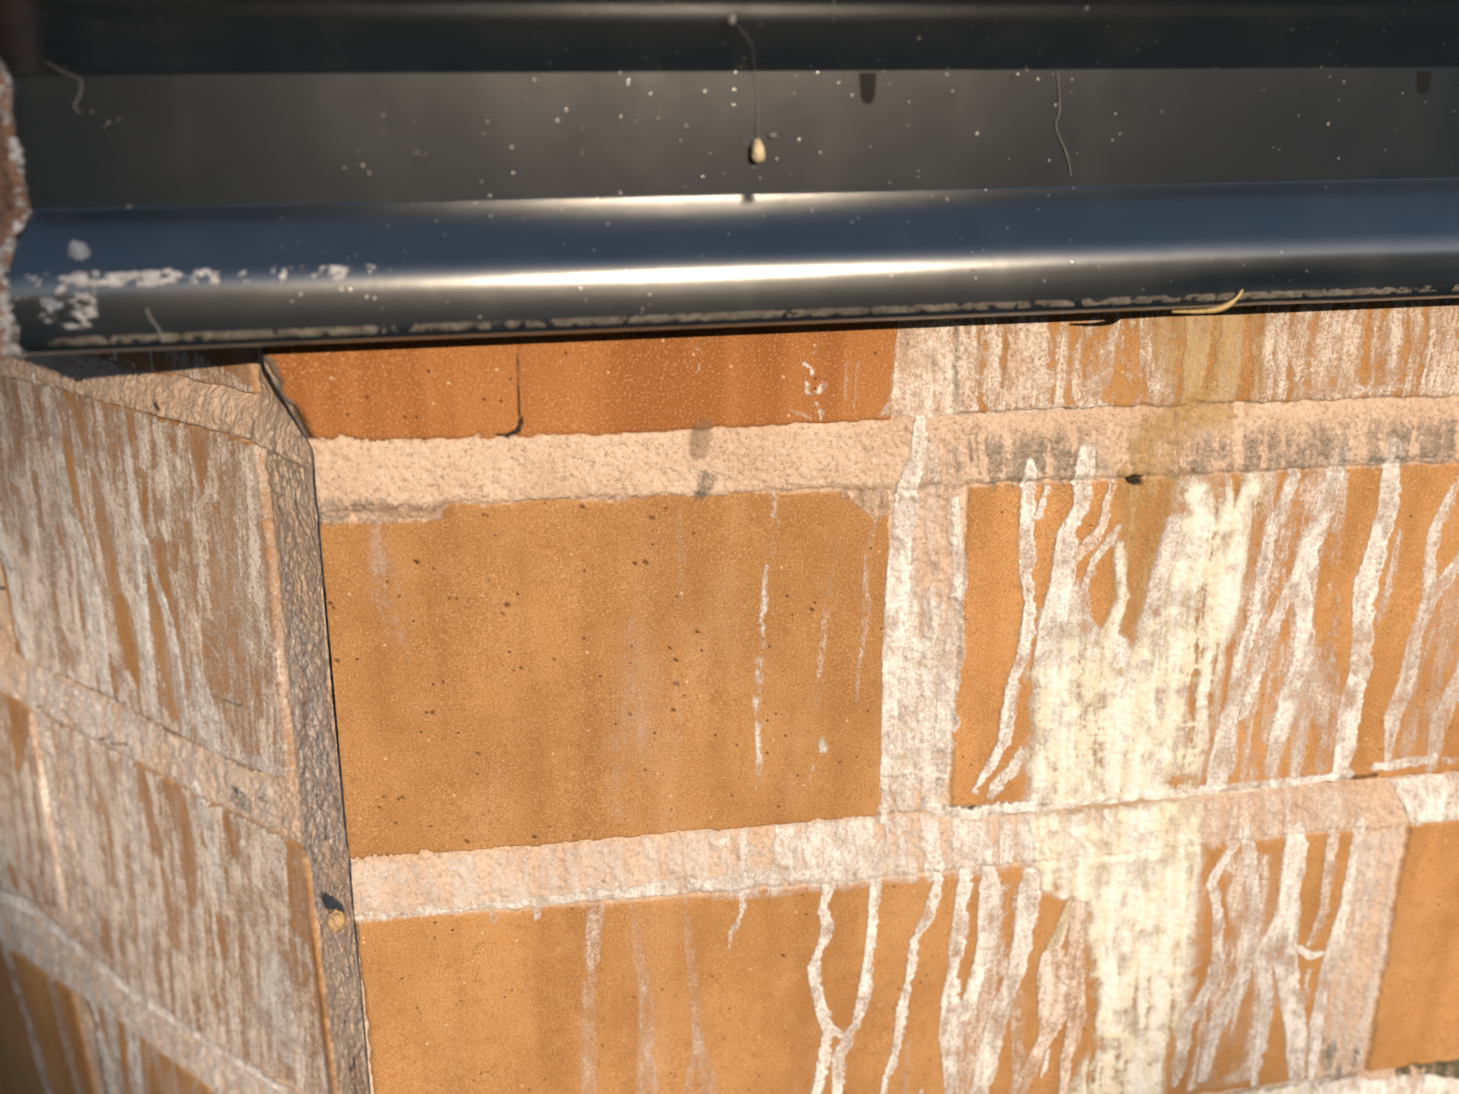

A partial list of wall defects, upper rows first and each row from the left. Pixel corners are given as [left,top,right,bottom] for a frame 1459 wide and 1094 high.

water stain [0,372,345,1094]
crack [497,387,523,438]
water stain [354,298,1459,1094]